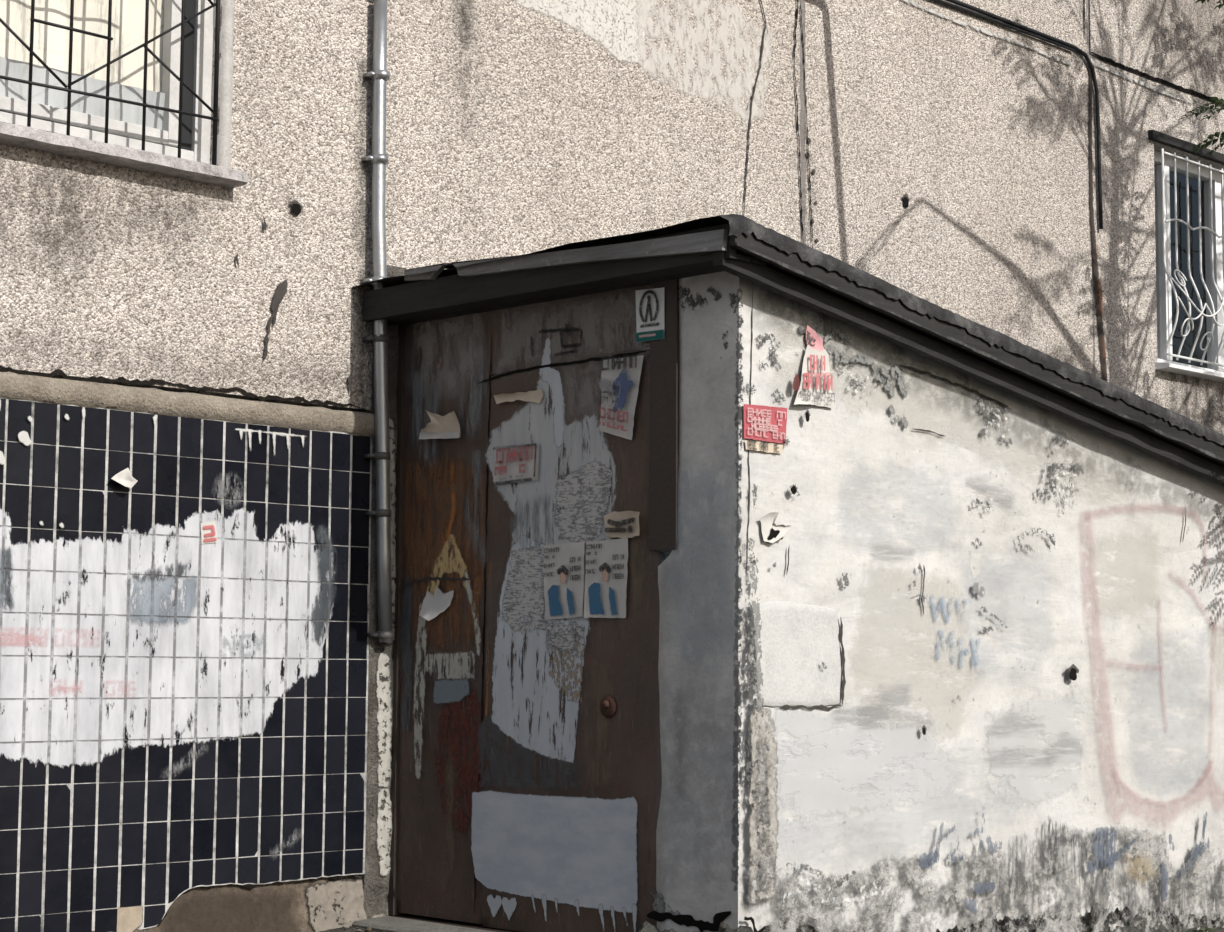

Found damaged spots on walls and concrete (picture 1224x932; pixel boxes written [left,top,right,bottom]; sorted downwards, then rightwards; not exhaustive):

crack [743,0,813,248]
peeling [376,418,396,877]
corrosion [404,459,491,646]
corrosion [435,672,489,833]
peeling [678,286,1224,932]
spalling [305,874,385,932]